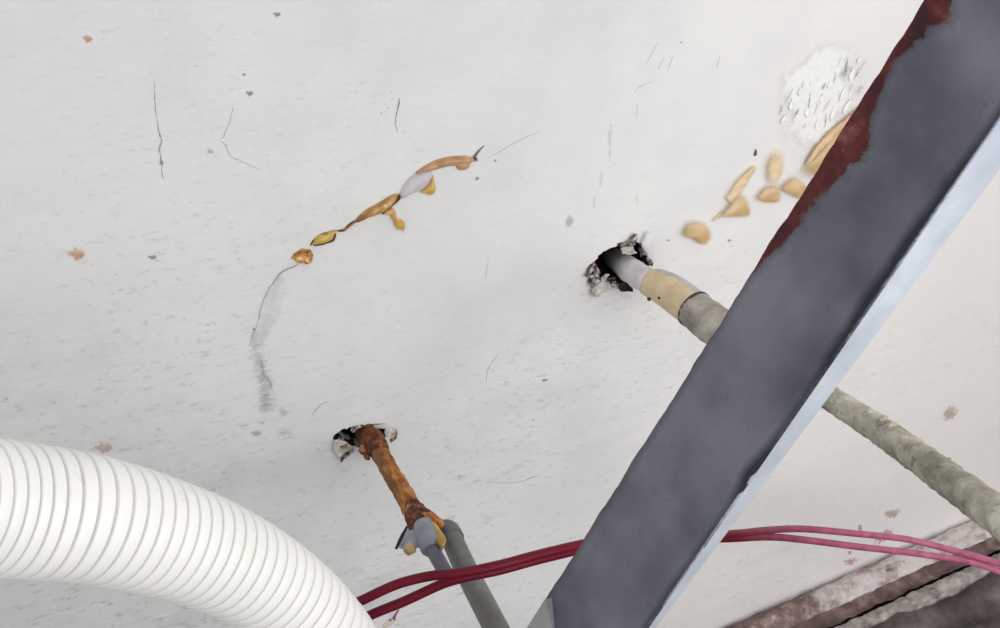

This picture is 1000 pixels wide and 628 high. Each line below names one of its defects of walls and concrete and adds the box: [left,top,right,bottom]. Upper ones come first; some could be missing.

crack [154,86,163,177]
crack [209,111,260,170]
spalling [585,232,654,298]
crack [250,264,298,344]
spalling [333,423,398,462]